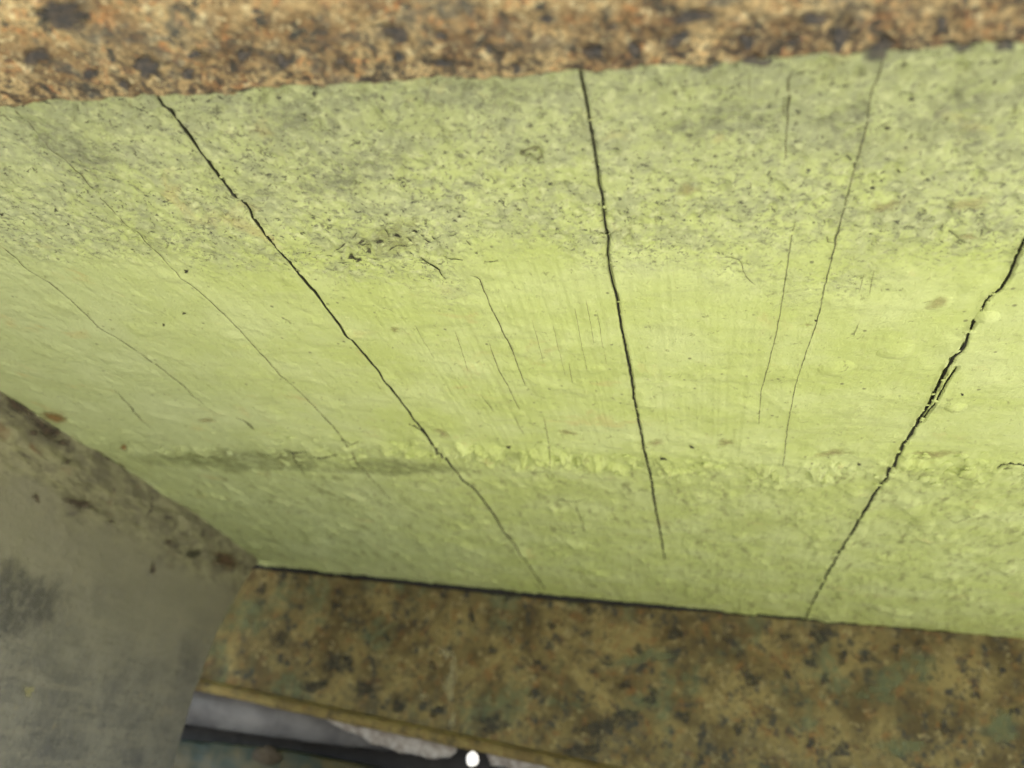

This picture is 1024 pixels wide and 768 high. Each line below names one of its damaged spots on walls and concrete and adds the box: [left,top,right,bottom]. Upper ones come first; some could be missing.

crack [5,116,390,499]
crack [157,96,545,589]
crack [423,70,665,559]
crack [783,58,884,463]
crack [805,239,1024,617]